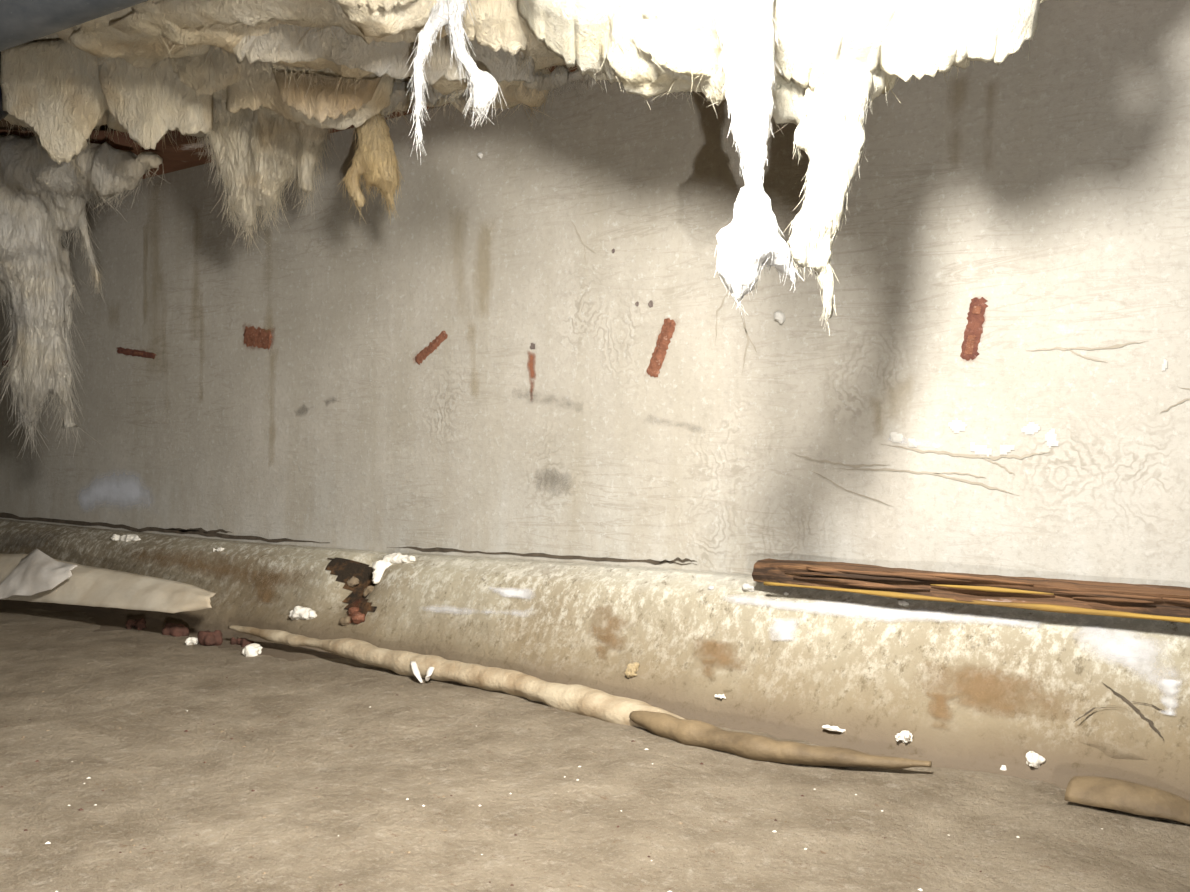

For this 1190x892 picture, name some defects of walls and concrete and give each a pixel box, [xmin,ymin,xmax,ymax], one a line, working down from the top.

rust [117,347,156,359]
rust [243,326,273,350]
rust [415,331,448,365]
rust [646,318,676,377]
rust [960,297,988,361]
crack [391,547,697,565]
spalling [325,557,377,626]